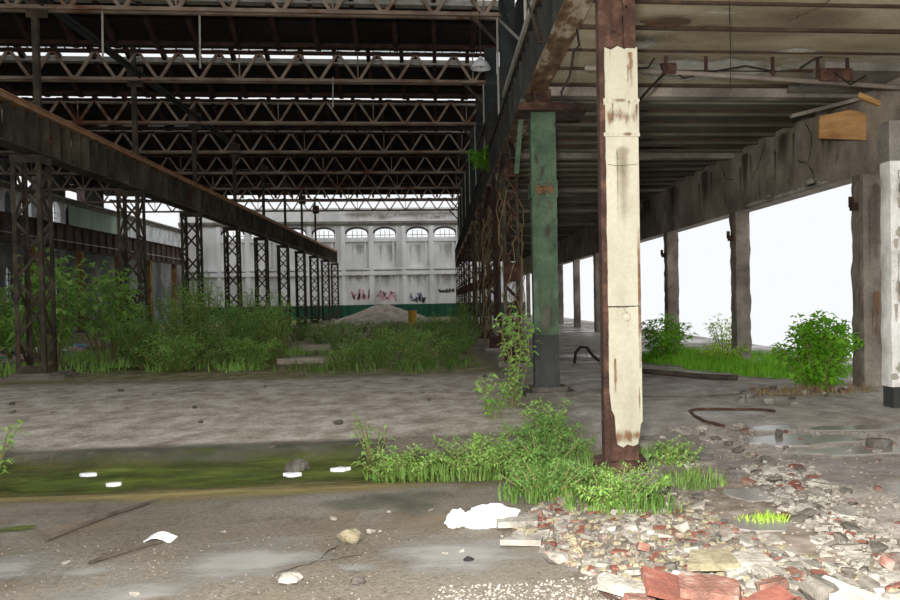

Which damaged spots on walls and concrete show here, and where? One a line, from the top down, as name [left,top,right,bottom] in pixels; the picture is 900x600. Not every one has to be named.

rust [617,431,640,441]